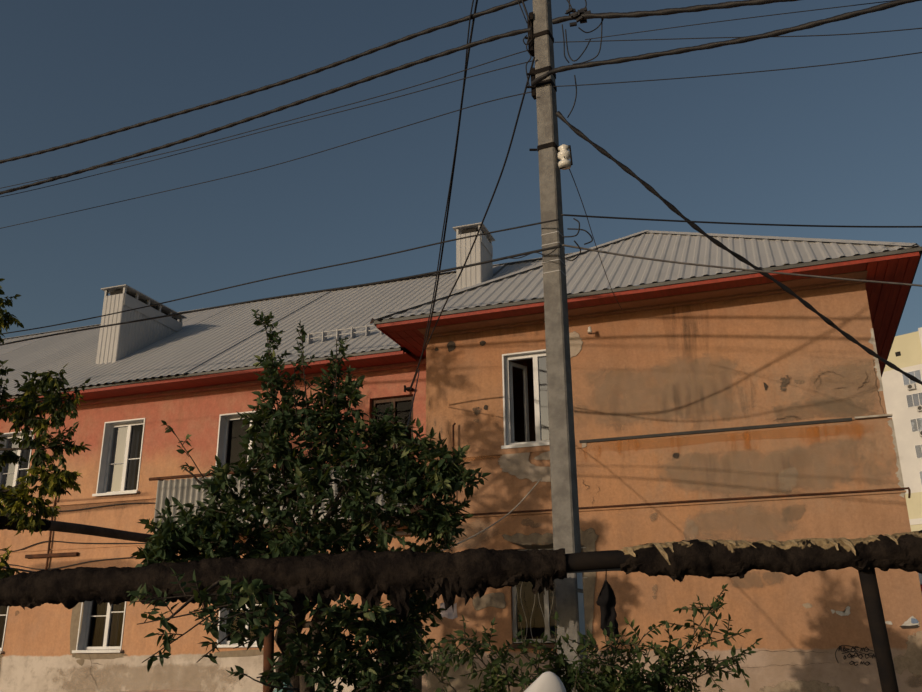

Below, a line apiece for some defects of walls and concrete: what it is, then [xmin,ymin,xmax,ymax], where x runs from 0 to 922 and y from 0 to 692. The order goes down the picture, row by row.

crack [816,360,885,414]
spalling [498,451,551,482]